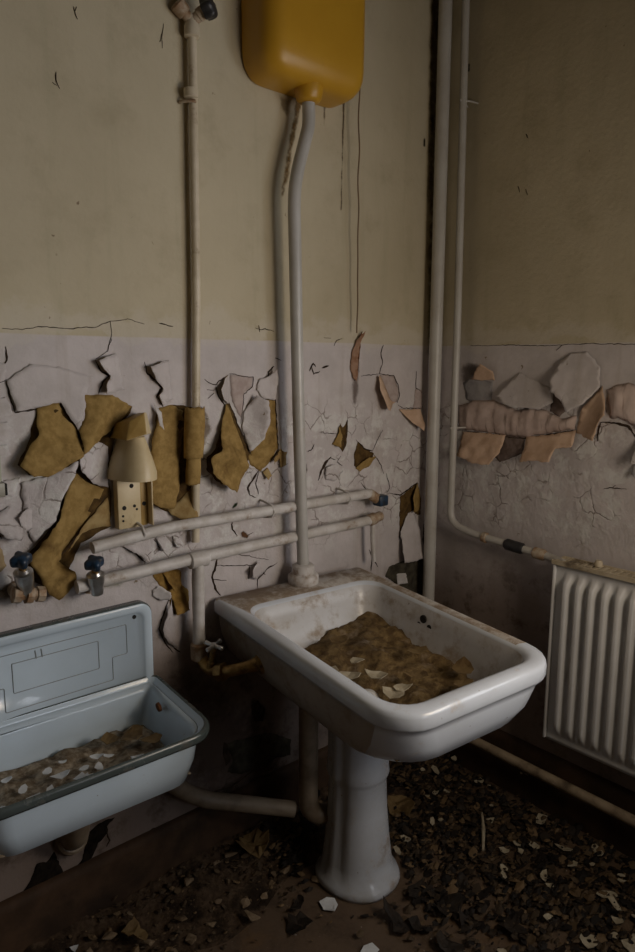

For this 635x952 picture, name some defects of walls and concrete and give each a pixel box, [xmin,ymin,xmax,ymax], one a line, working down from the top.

crack [2,319,173,343]
peeling [0,339,132,600]
peeling [145,358,287,520]
peeling [363,346,425,431]
peeling [457,352,607,465]
peeling [123,536,184,563]
peeling [152,569,190,652]
peeling [239,554,277,587]
peeling [385,482,424,596]
spalling [23,852,63,891]
spalling [78,817,115,865]